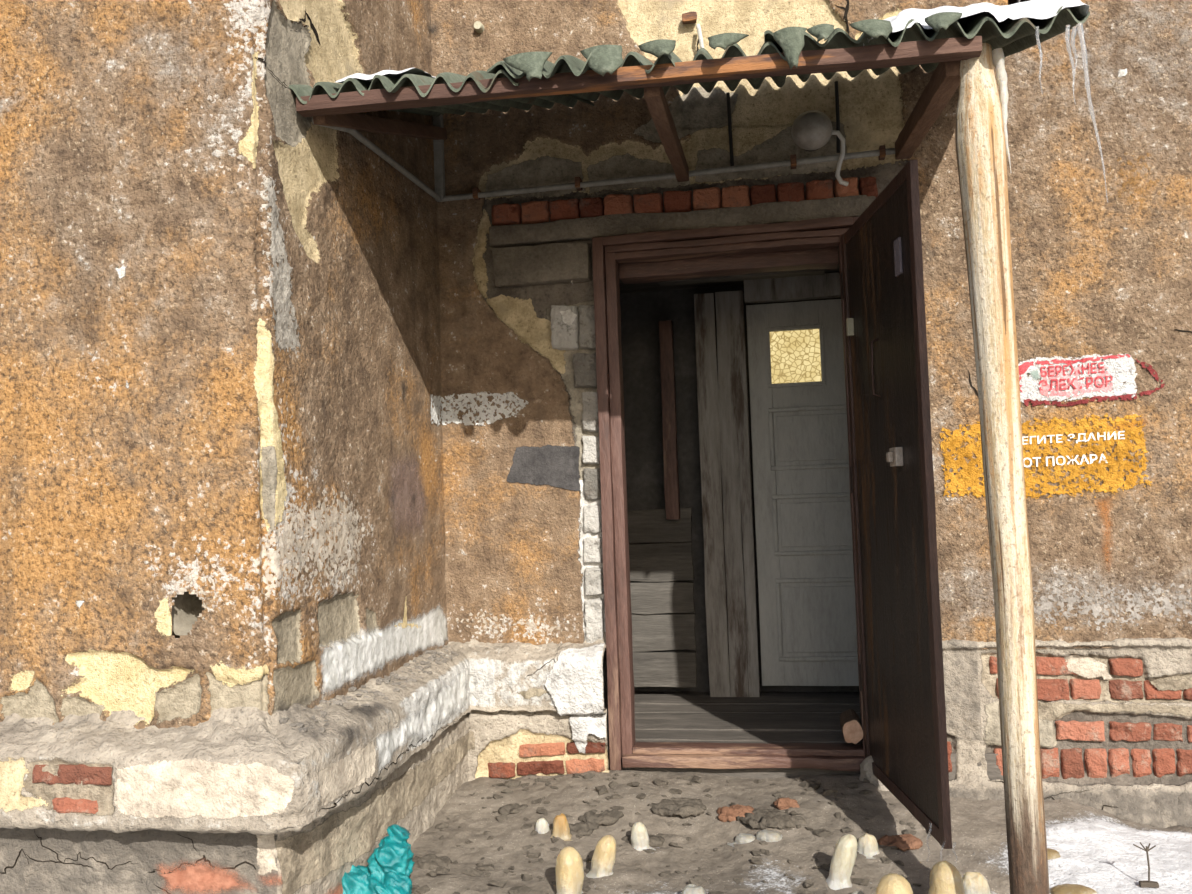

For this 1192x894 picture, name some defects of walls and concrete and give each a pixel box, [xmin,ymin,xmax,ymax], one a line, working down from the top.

flaking render [617,0,863,62]
crack [835,0,850,34]
flaking render [237,0,364,263]
flaking render [472,67,908,651]
spalling [253,318,287,531]
spalling [154,574,217,636]
flaking render [0,592,448,725]
flaking render [1036,653,1192,786]
flaking render [0,757,115,816]
flaking render [475,729,609,779]
crack [0,827,256,894]
peeling [256,835,278,875]